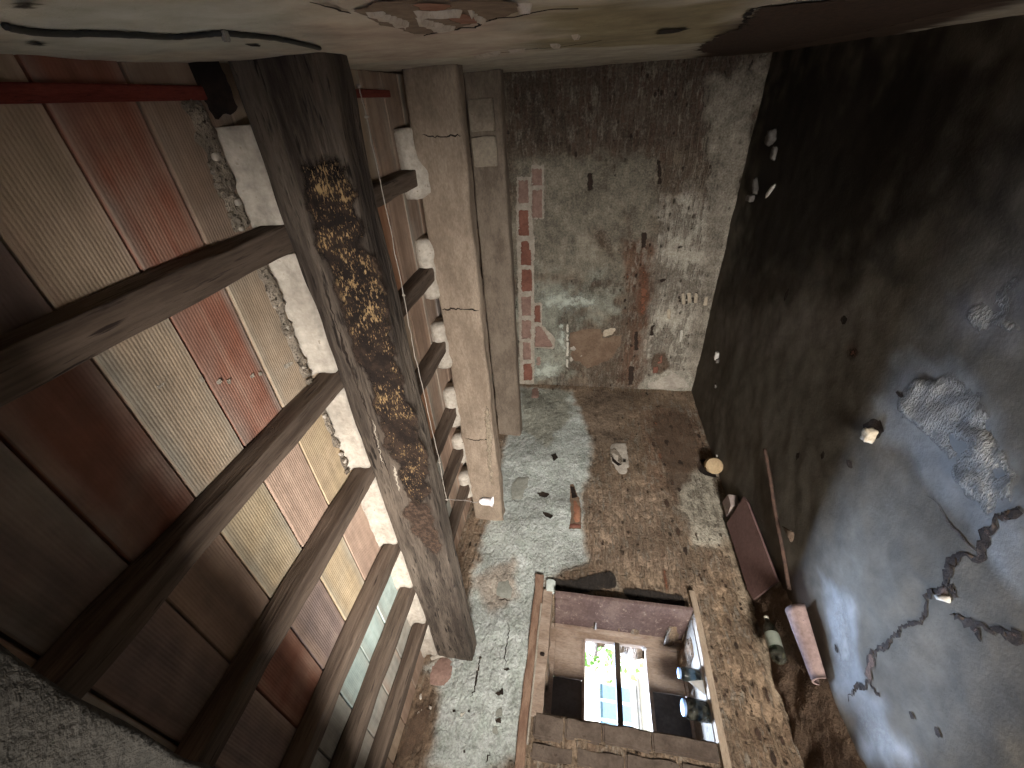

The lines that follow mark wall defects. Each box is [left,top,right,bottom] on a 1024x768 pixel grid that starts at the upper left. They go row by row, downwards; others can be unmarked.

peeling [354,0,578,36]
crack [423,132,459,140]
crack [848,496,1024,701]